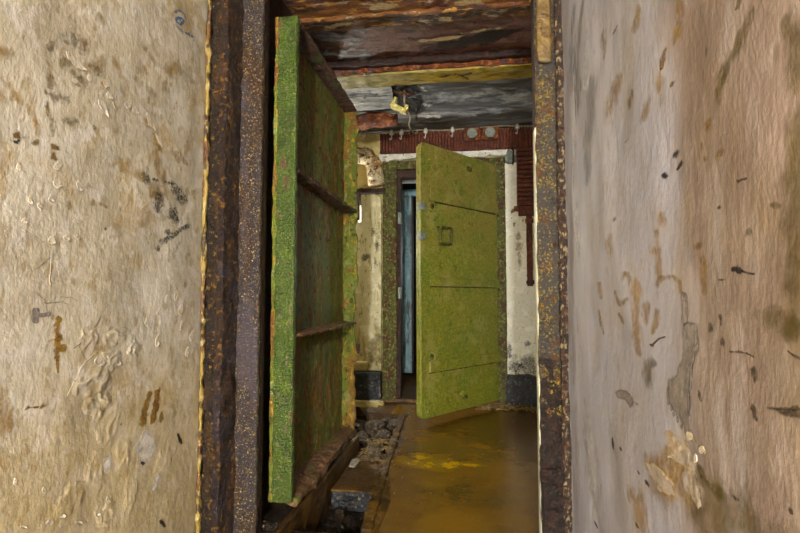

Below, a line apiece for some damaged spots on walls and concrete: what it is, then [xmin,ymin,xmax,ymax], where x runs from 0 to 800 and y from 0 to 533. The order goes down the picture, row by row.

peeling [369,2,398,10]
peeling [316,21,371,59]
peeling [417,27,521,54]
spalling [392,84,424,115]
mould [141,172,189,252]
rust [54,316,67,373]
mould [507,344,536,375]
rust [140,388,164,426]
rust [538,358,566,533]